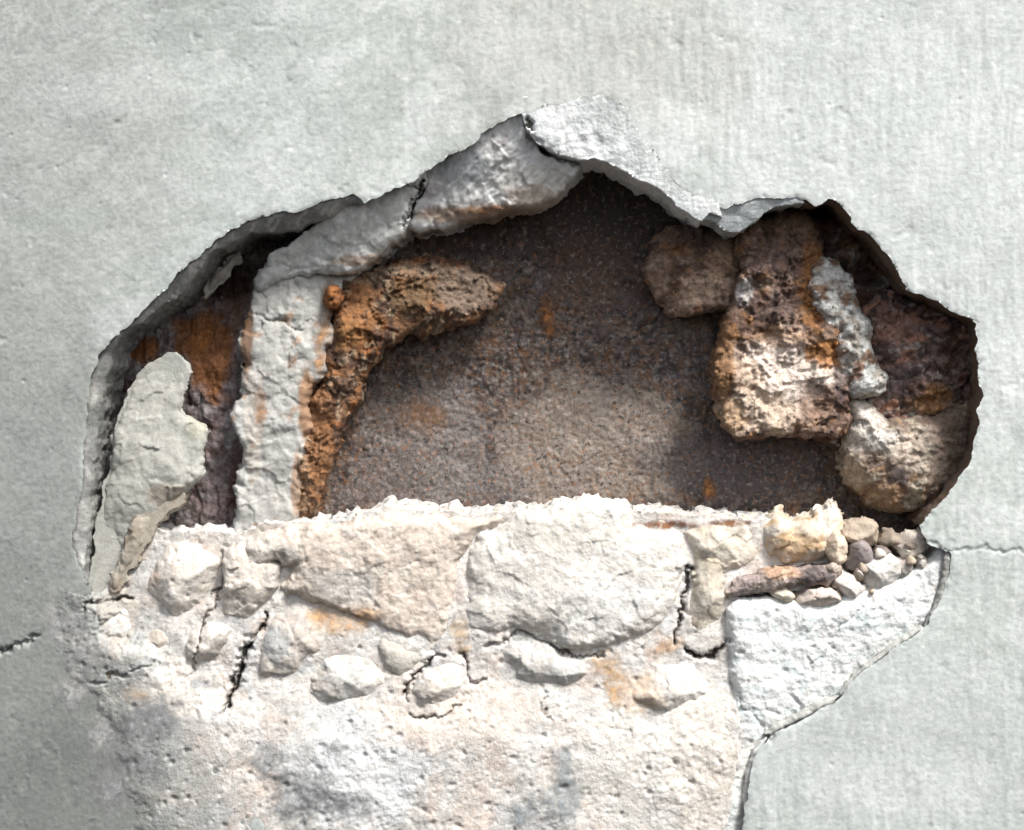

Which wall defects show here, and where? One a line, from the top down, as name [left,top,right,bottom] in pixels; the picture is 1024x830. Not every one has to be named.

corrosion [118,239,295,528]
peeling [72,194,365,596]
spalling [521,93,984,525]
corrosion [706,208,853,442]
crack [227,612,269,708]
crack [673,565,723,658]
peeling [724,542,951,830]